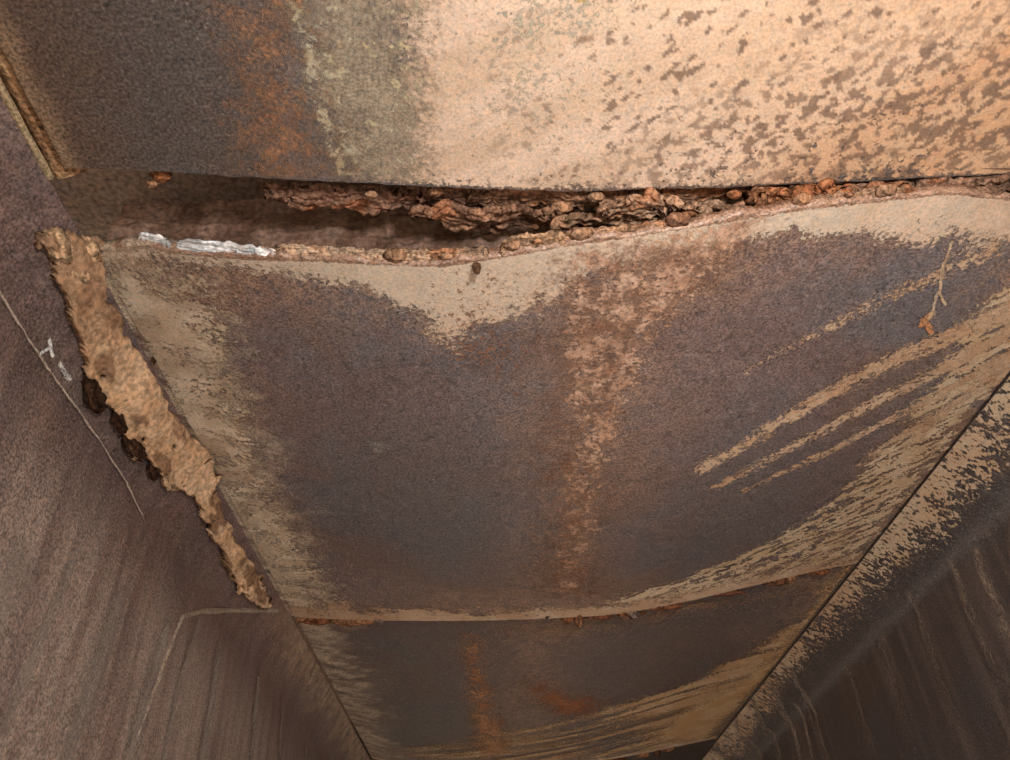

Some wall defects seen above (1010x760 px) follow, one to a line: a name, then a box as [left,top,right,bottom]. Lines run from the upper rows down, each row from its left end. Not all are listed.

corrosion [220,0,339,177]
corrosion [348,0,1010,190]
corrosion [286,216,1010,760]